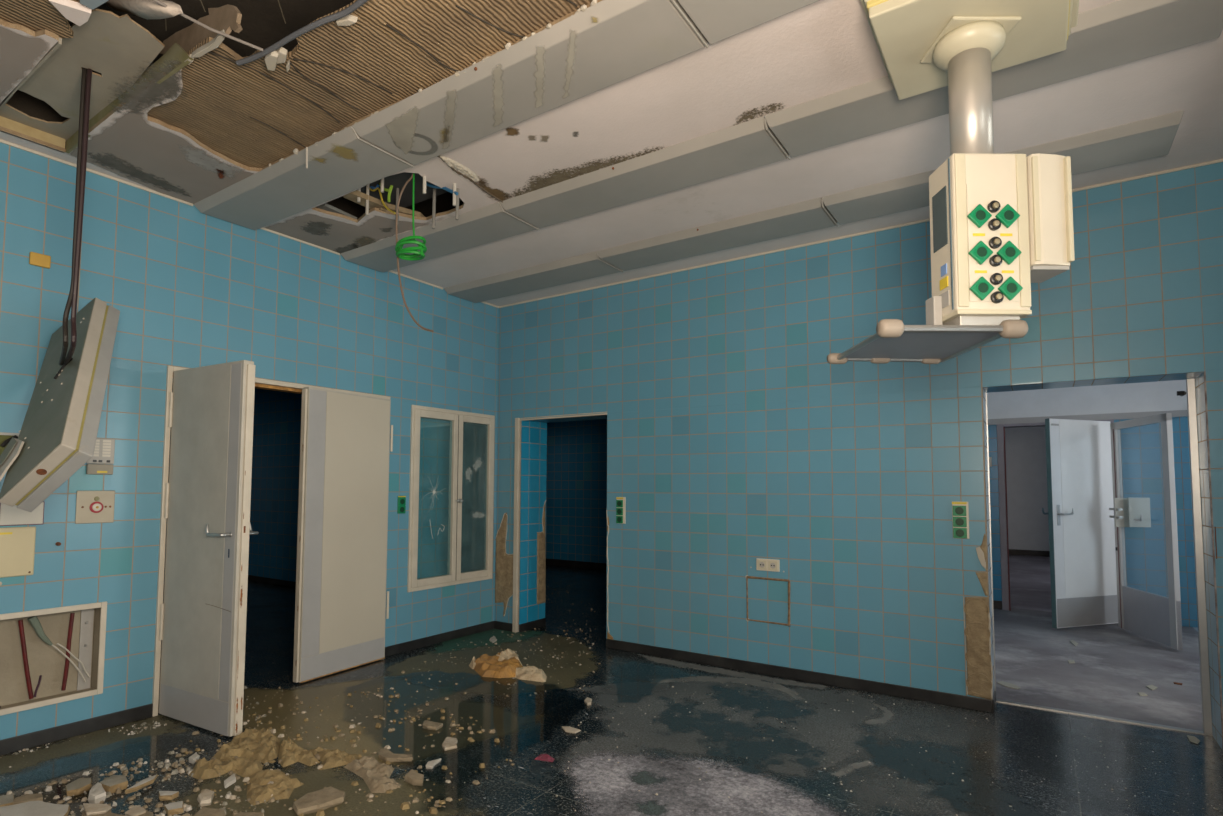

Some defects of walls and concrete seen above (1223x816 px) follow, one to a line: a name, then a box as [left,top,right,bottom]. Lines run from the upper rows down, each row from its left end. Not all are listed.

spalling [495,513,513,617]
spalling [537,501,546,604]
spalling [963,534,993,700]
damp [564,654,1044,816]